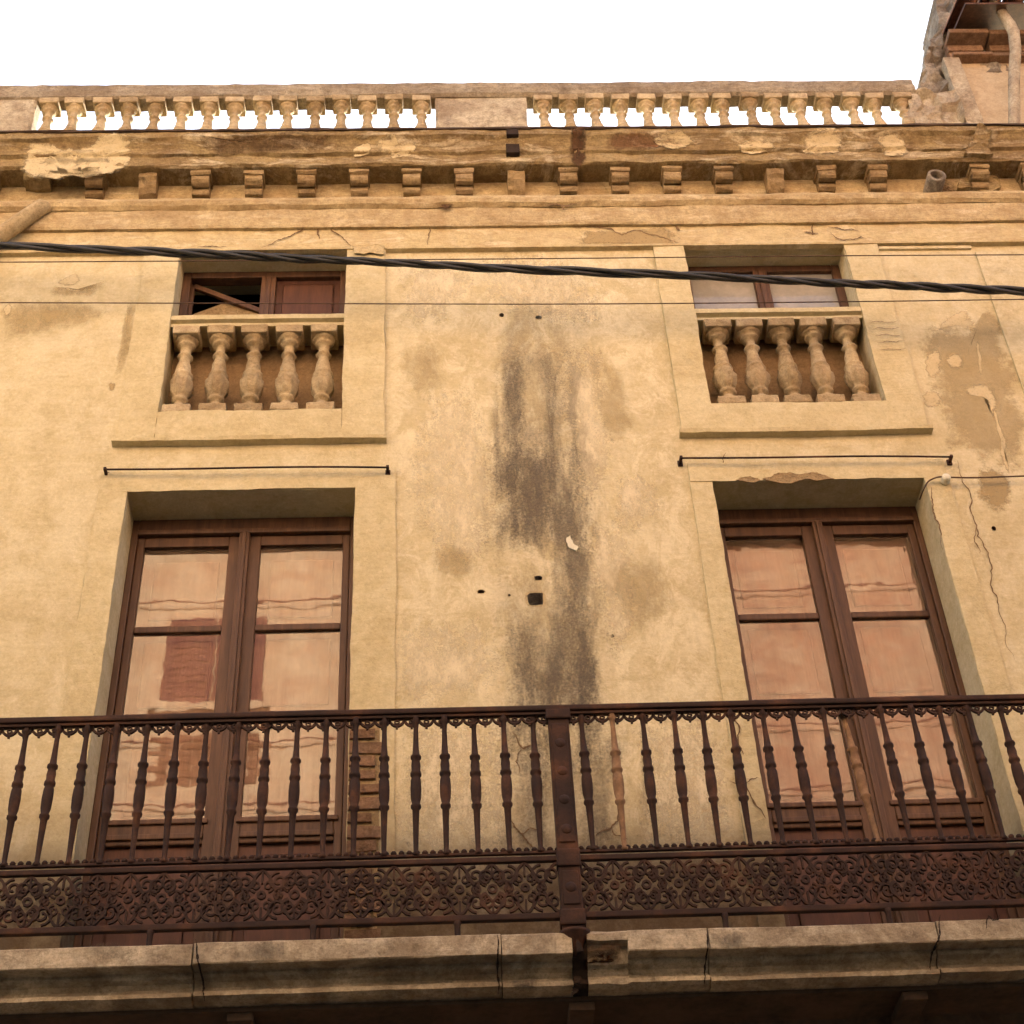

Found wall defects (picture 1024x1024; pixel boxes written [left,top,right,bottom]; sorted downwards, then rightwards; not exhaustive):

flaking render [23,133,131,179]
flaking render [802,128,842,155]
flaking render [878,132,909,156]
crack [264,229,351,247]
damp [409,269,472,317]
damp [488,256,593,320]
spalling [736,472,834,484]
crack [931,487,943,550]
crack [958,463,1015,659]
damp [409,732,500,847]
damp [649,727,728,832]
crack [929,915,941,970]